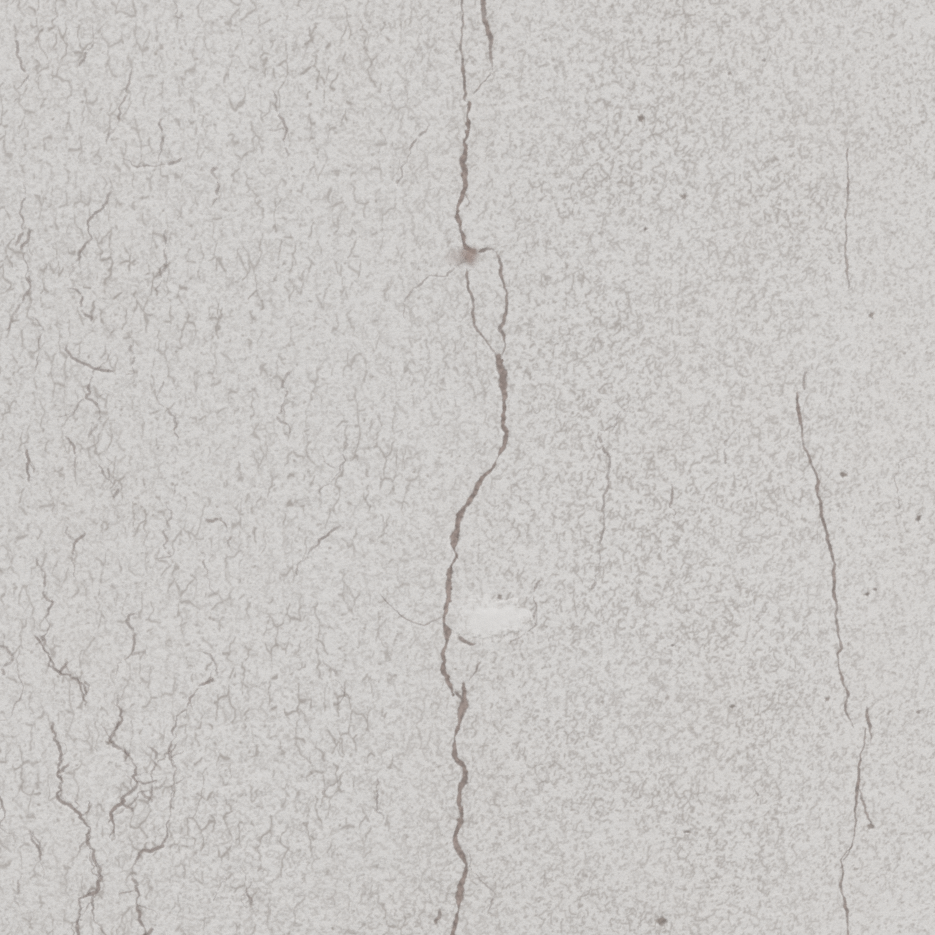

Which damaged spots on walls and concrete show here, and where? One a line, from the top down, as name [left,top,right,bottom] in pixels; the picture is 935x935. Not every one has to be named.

crack [462,0,493,47]
crack [795,395,803,427]
crack [434,62,509,935]
crack [807,453,837,602]
crack [54,666,87,703]
crack [837,627,872,728]
crack [51,724,103,906]
crack [109,710,138,832]
crack [854,759,868,816]
crack [136,841,165,860]
crack [135,887,153,935]
crack [839,874,849,935]